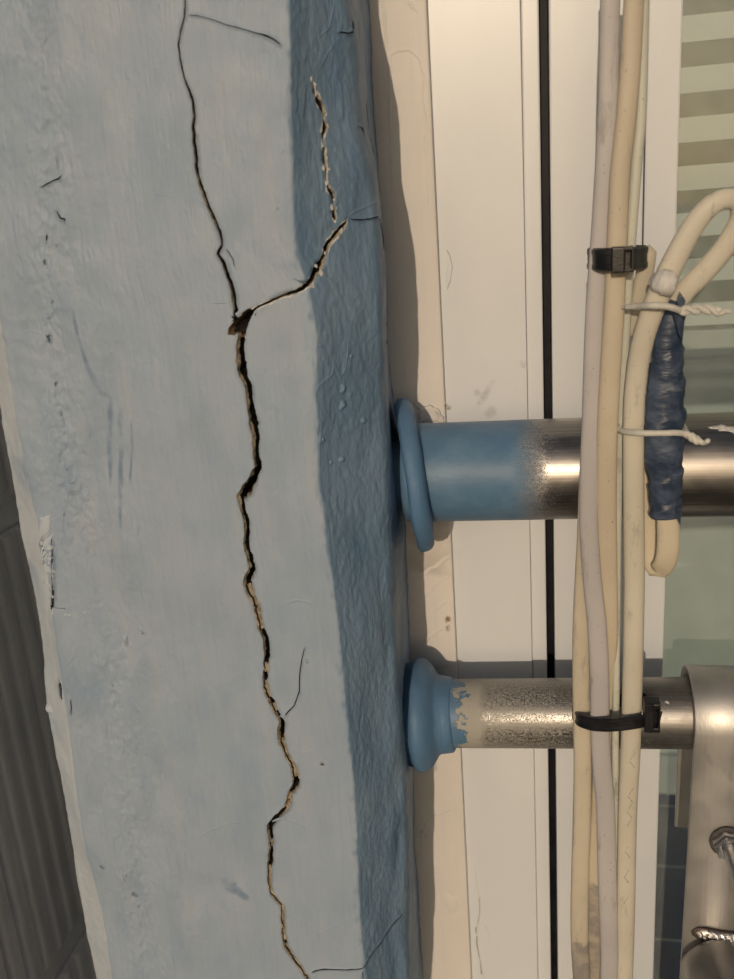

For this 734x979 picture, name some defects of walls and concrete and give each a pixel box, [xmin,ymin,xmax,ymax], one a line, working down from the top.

crack [141,0,403,979]